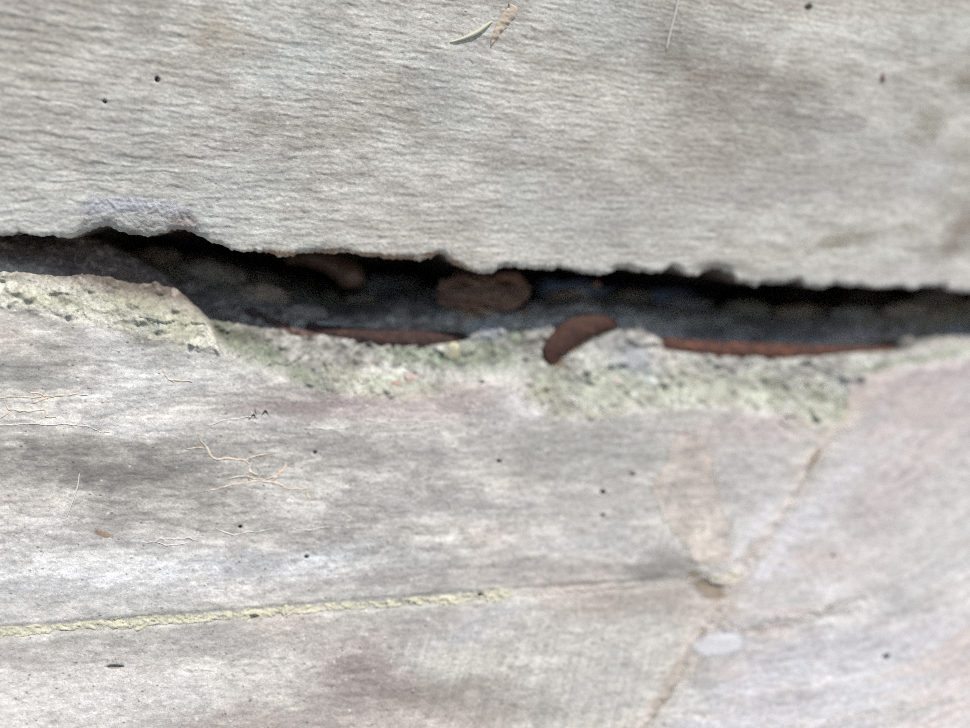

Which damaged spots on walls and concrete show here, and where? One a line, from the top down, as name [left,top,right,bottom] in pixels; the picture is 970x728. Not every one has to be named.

spalling [0,194,970,426]